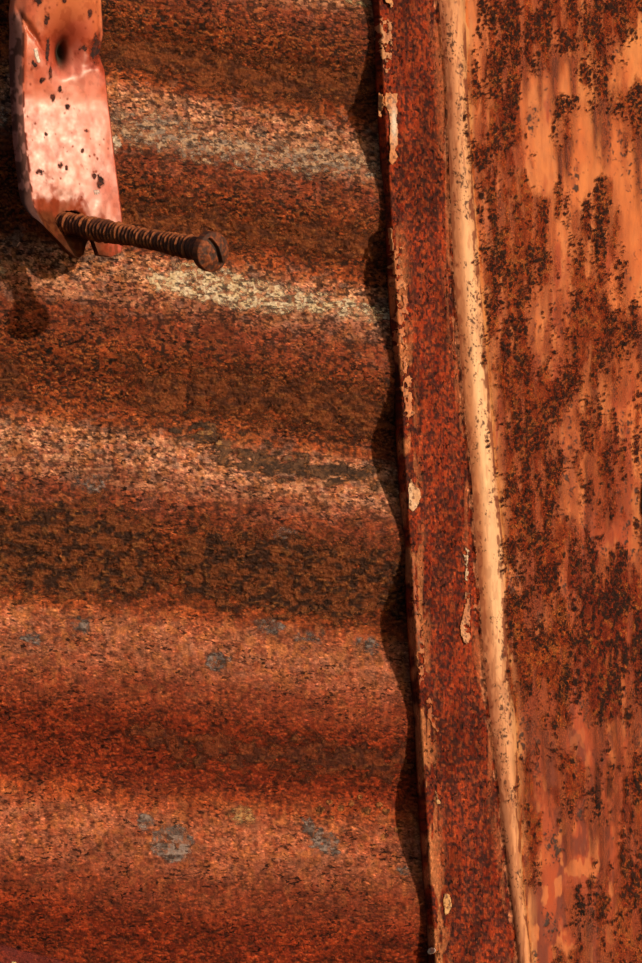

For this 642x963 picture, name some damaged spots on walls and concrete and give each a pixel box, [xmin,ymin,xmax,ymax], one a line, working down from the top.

peeling [374,17,393,73]
peeling [378,92,398,165]
rust [168,409,397,491]
rust [461,0,642,963]
rust [316,795,390,819]